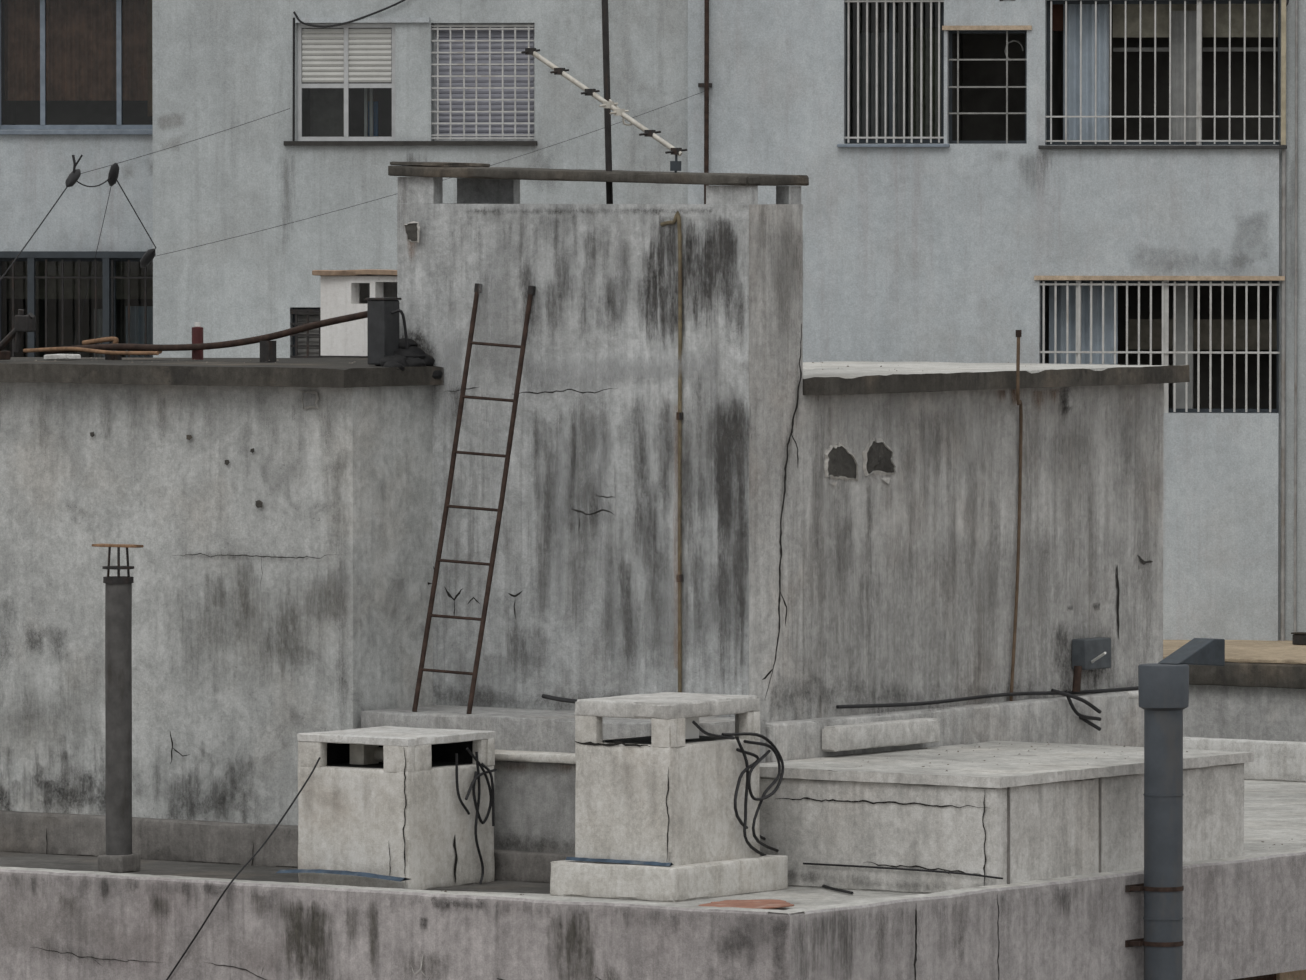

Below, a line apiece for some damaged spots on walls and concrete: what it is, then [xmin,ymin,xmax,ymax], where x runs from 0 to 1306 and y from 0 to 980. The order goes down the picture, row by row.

damp [646,225,733,331]
spalling [824,438,896,487]
damp [35,756,105,812]
crack [35,947,163,964]